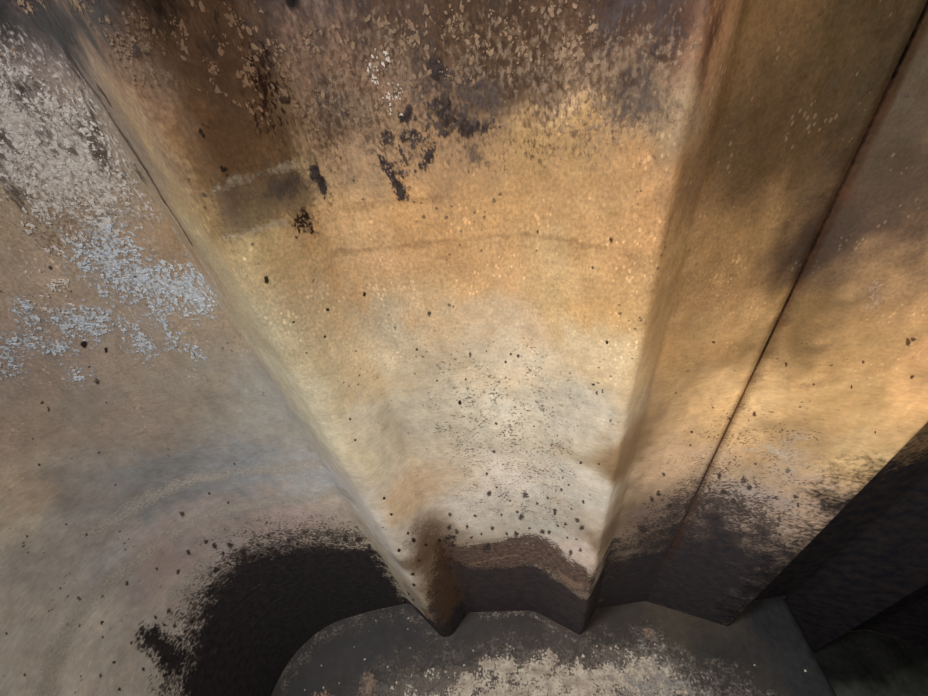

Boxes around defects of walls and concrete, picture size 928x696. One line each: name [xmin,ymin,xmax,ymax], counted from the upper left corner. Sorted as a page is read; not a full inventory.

peeling [57,0,179,106]
peeling [309,157,327,199]
peeling [365,30,501,201]
peeling [524,18,700,145]